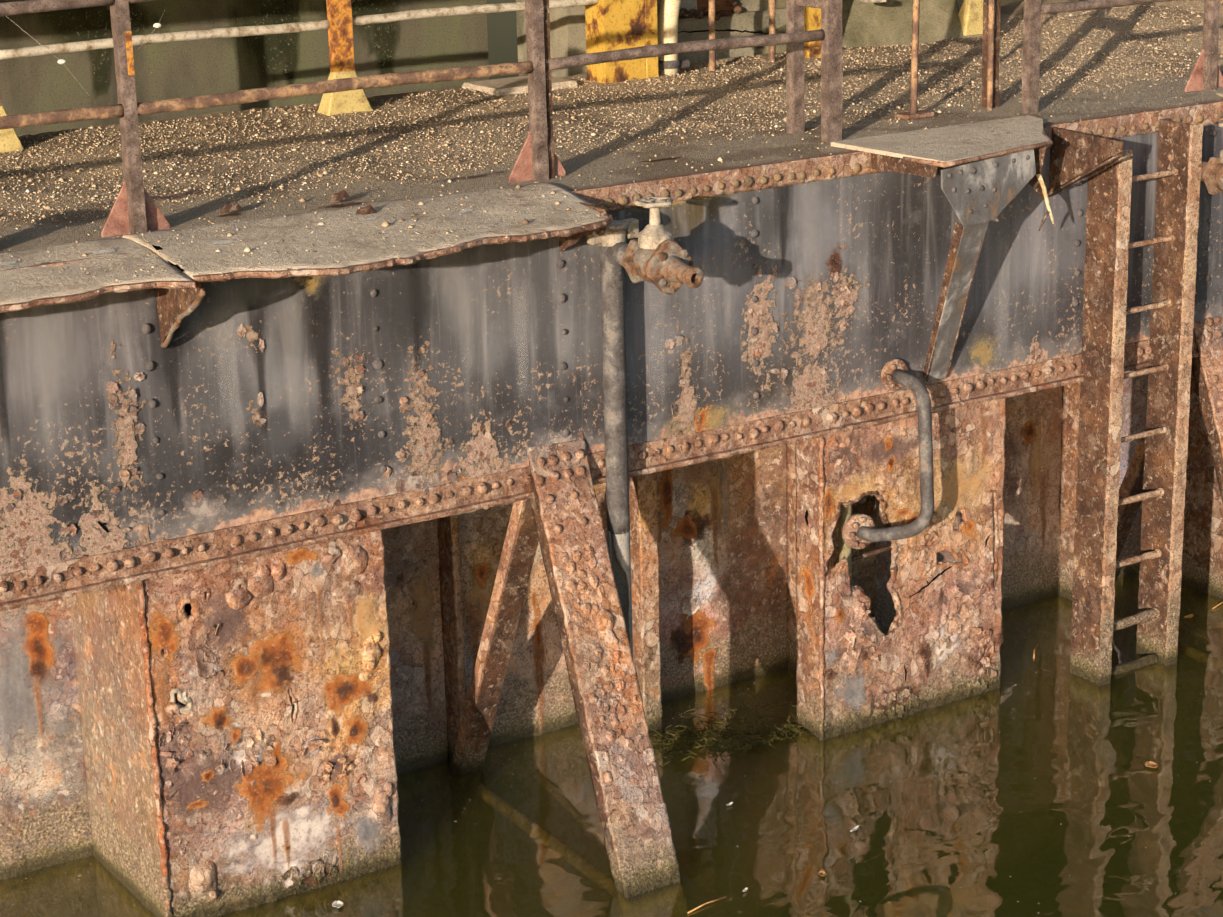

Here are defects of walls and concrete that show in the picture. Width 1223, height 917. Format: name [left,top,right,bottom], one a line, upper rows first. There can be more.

peeling [0,340,167,575]
peeling [329,347,372,449]
peeling [378,329,512,496]
peeling [665,324,705,438]
peeling [740,244,870,414]
corrosion [21,606,55,738]
corrosion [204,595,302,712]
corrosion [315,651,381,763]
corrosion [559,546,655,784]
corrosion [669,598,717,699]
spalling [835,566,895,678]
corrosion [169,708,382,888]